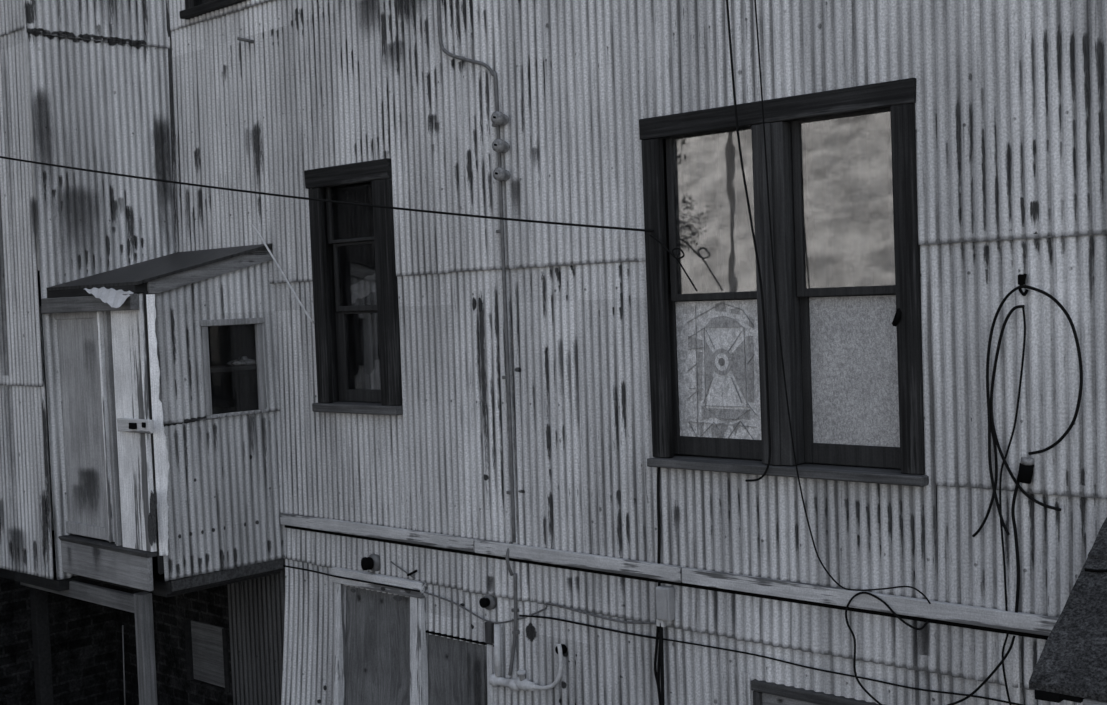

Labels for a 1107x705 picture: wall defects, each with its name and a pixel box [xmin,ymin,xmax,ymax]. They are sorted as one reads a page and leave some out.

leakage [35,93,49,163]
rust [24,0,148,61]
rust [106,186,143,267]
leakage [153,120,171,212]
rust [166,0,211,253]
rust [381,0,439,131]
rust [442,0,486,69]
rust [455,72,493,226]
rust [936,100,1094,298]
rust [1031,25,1104,220]
rust [472,265,575,504]
rust [533,347,564,548]